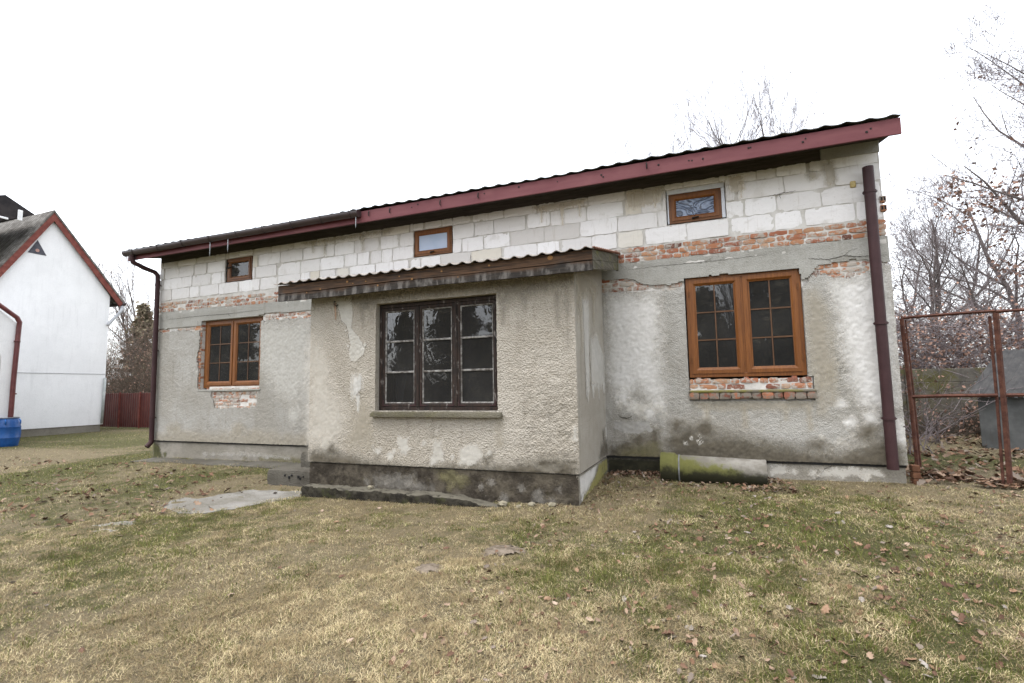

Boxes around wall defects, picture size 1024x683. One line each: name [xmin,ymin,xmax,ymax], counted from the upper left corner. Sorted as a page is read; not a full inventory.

spalling [159,325,259,408]
spalling [334,297,366,362]
water stain [600,296,907,473]
water stain [429,440,579,474]